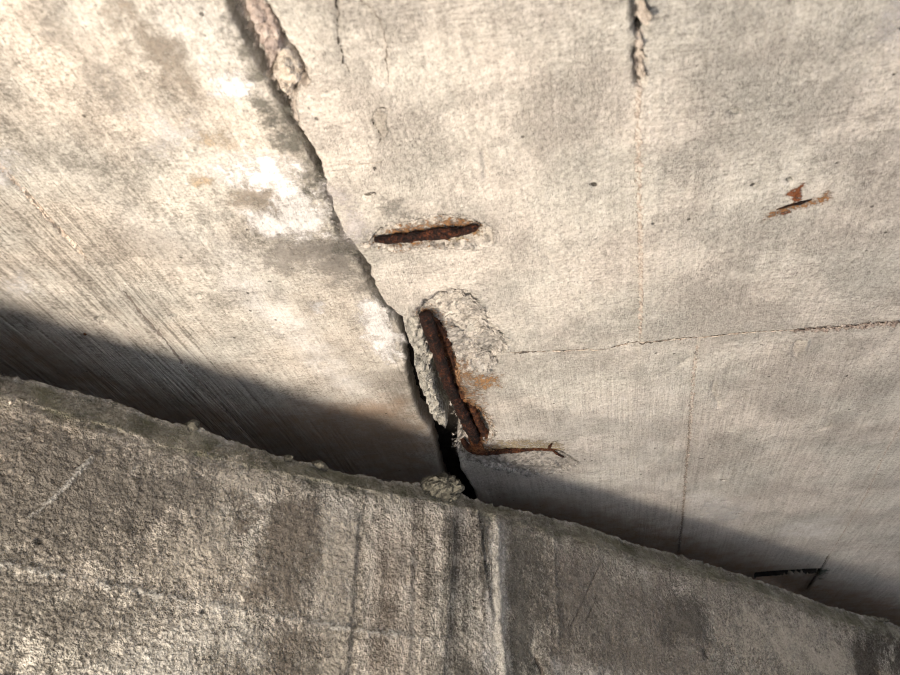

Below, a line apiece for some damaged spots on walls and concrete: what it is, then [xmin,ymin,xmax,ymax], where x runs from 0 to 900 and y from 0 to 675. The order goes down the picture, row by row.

crack [335,0,352,75]
crack [360,0,389,83]
crack [346,107,389,165]
rust [369,215,482,253]
rust [761,183,830,222]
crack [507,0,900,552]
spalling [414,288,513,379]
rust [416,303,564,456]
crack [405,331,486,568]
spalling [449,398,581,478]
crack [754,428,900,586]